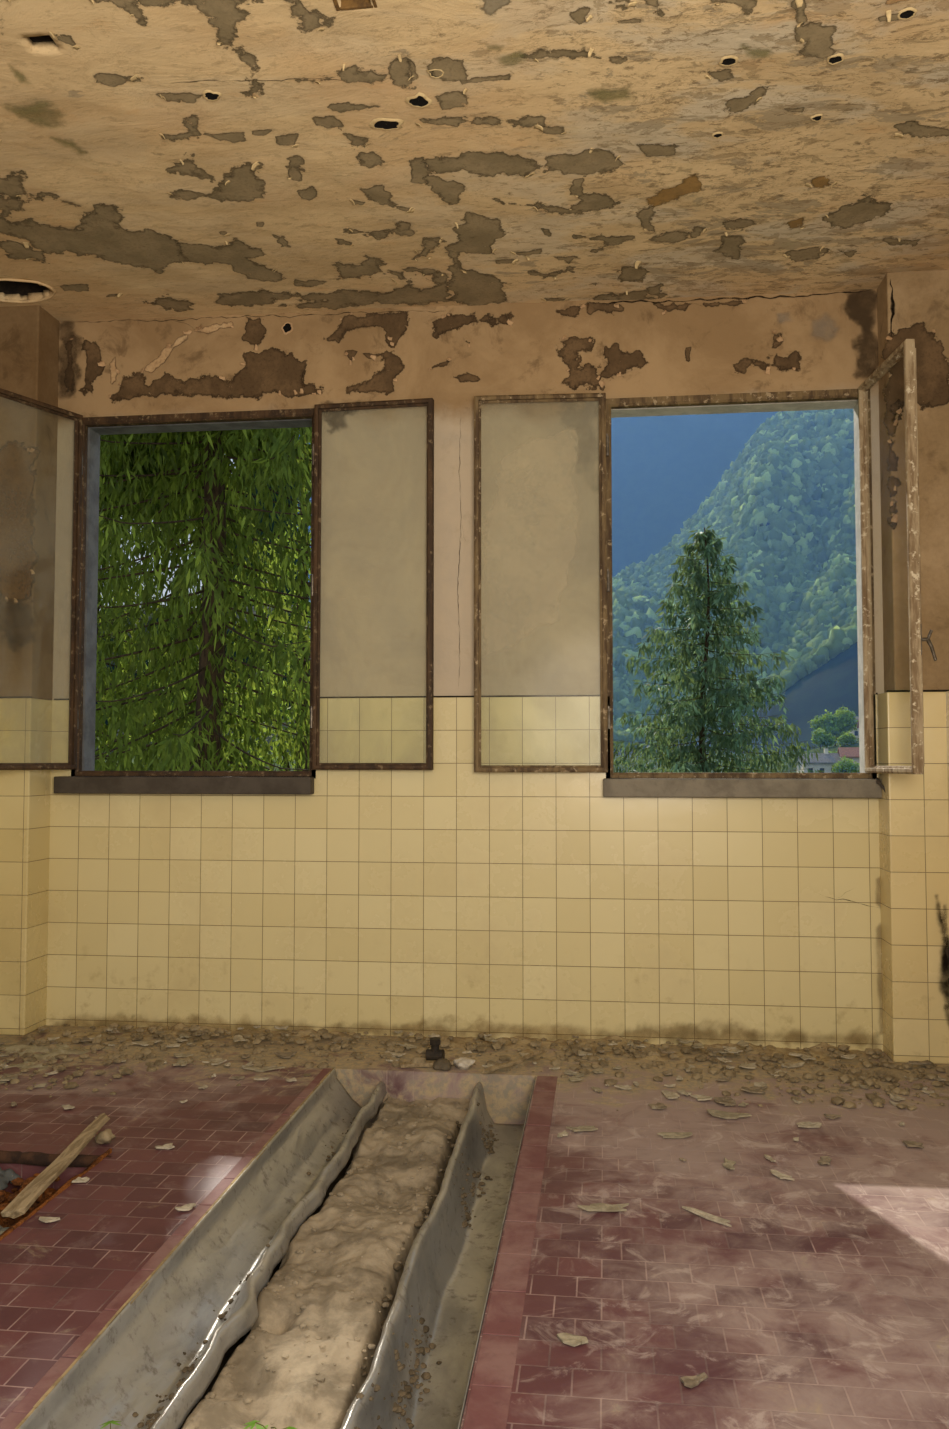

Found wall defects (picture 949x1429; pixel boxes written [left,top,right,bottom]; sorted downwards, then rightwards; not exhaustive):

peeling [285,0,335,33]
peeling [711,0,758,15]
peeling [878,0,918,22]
peeling [791,0,845,65]
peeling [90,0,265,99]
peeling [637,144,678,157]
peeling [805,175,837,188]
peeling [822,194,893,229]
peeling [787,218,806,229]
peeling [883,238,921,247]
peeling [782,246,857,262]
peeling [0,148,757,403]